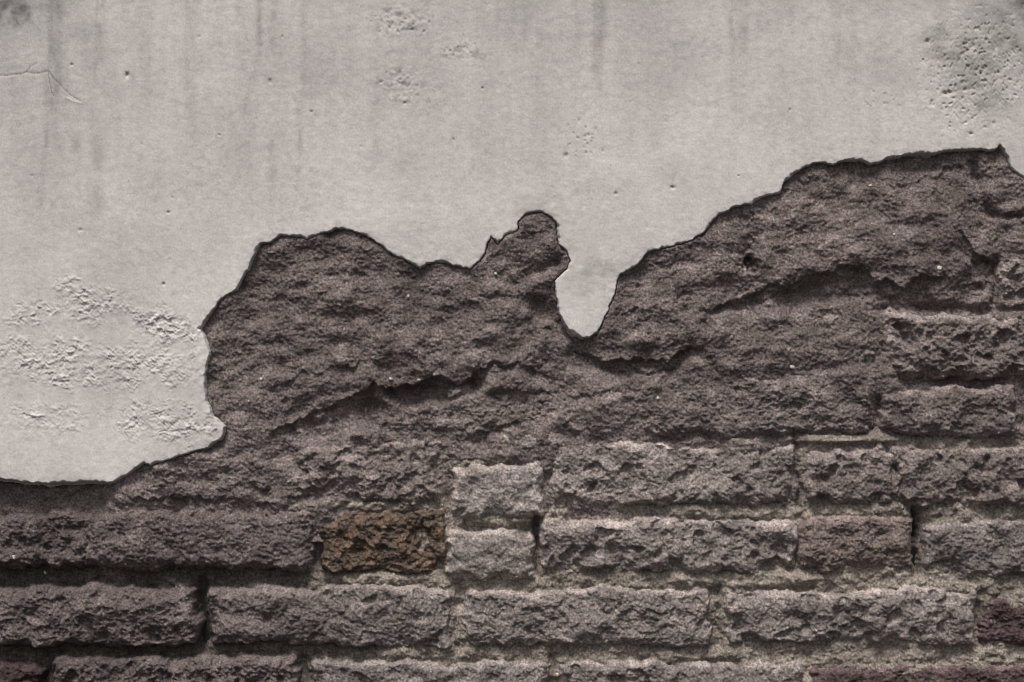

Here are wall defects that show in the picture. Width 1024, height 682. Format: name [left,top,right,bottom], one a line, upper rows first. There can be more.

crack [0,63,80,101]
flaking render [900,0,1024,151]
flaking render [0,143,1024,581]
spalling [0,581,452,650]
spalling [461,584,713,648]
spalling [724,585,1024,646]
spalling [0,658,50,682]
spalling [809,663,1024,682]